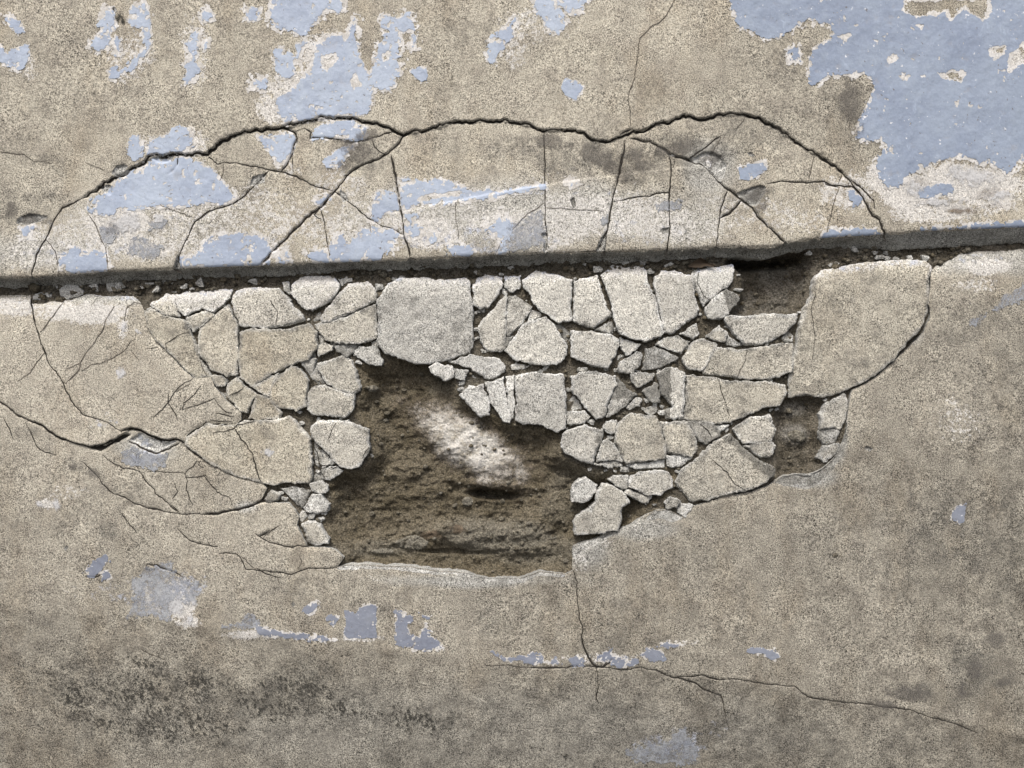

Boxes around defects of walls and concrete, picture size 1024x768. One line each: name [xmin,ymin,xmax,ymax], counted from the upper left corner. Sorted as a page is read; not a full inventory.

peeling [85,0,156,83]
peeling [240,0,428,186]
peeling [530,0,593,36]
peeling [727,0,1024,201]
peeling [57,125,240,274]
peeling [175,176,549,269]
crack [0,1,886,584]
spalling [726,249,817,317]
spalling [322,357,682,584]
spalling [772,395,848,489]
peeling [490,640,685,668]
crack [486,571,977,733]